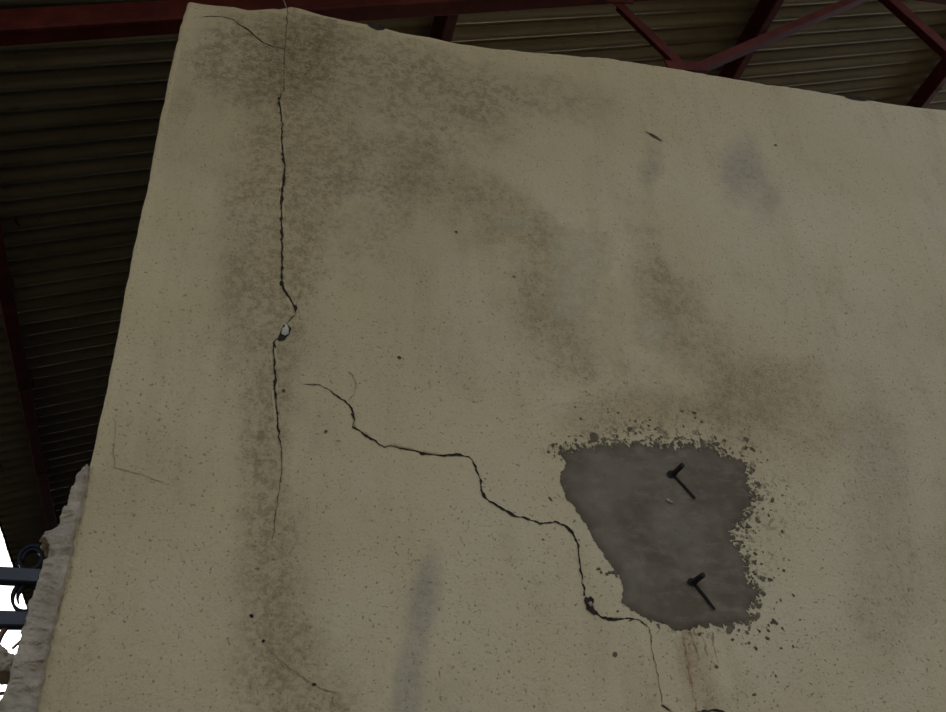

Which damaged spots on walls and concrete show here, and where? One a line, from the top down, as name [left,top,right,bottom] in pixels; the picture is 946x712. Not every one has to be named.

crack [201,8,302,539]
spalling [0,464,89,712]
crack [306,371,674,712]
spalling [584,596,597,615]
crack [697,704,725,712]